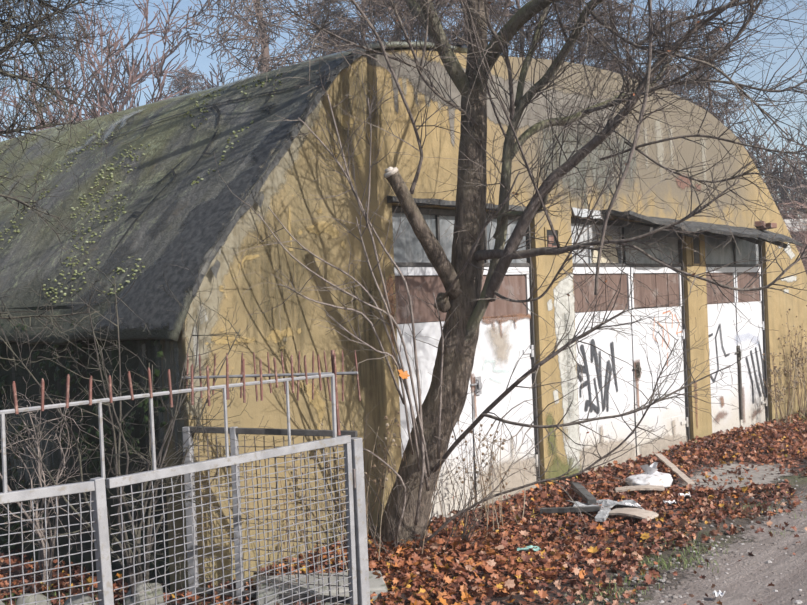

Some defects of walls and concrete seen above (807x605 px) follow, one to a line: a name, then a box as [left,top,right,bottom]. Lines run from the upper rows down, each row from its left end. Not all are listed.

spalling [184,87,330,419]